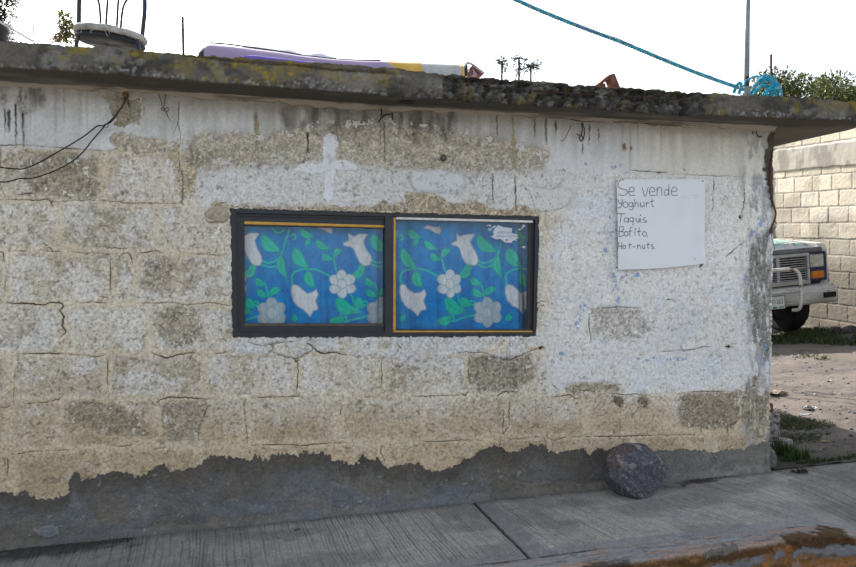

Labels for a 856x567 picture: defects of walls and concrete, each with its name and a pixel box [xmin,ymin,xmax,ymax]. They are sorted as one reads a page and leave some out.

leakage [4,104,24,135]
crack [1,244,159,408]
crack [152,351,229,359]
crack [244,341,345,446]
crack [151,396,209,440]
peeling [706,525,856,567]